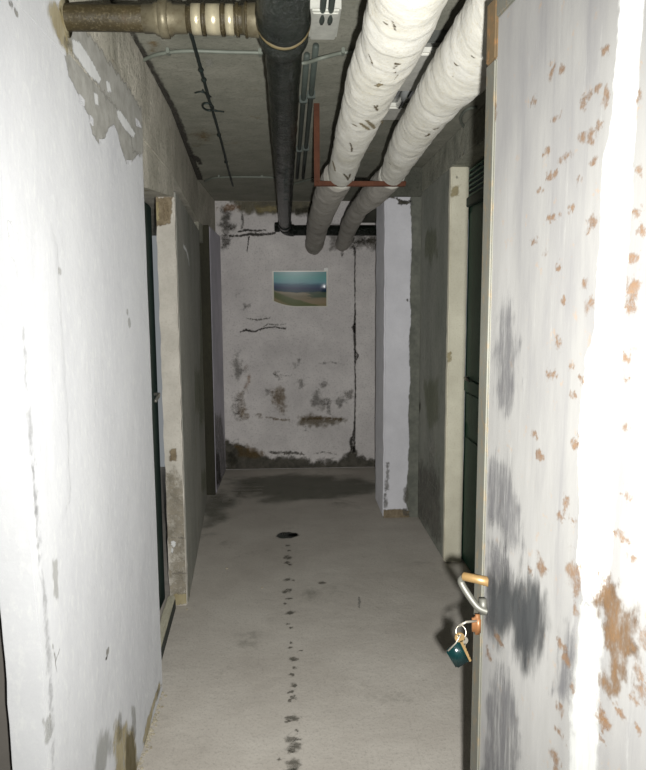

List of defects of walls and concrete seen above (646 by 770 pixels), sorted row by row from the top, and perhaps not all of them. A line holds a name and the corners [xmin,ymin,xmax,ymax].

peeling [49,3,143,166]
crack [229,229,276,250]
crack [240,318,286,332]
crack [349,248,359,451]
leakage [242,476,373,500]
corrosion [591,572,646,695]